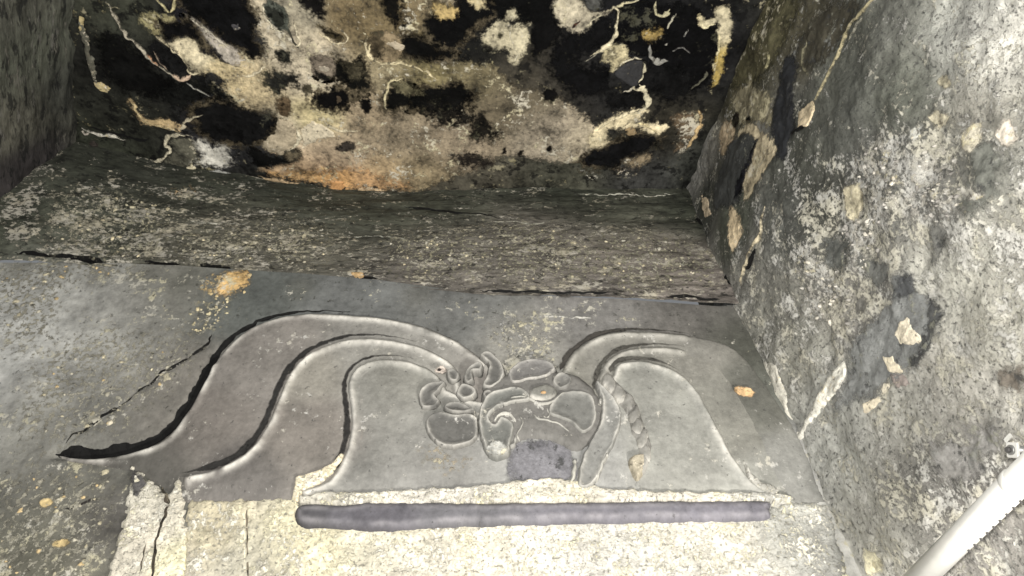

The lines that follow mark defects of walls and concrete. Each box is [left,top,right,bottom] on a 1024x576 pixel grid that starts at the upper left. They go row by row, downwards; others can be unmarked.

water stain [78,16,111,93]
water stain [193,138,235,173]
crack [66,335,212,443]